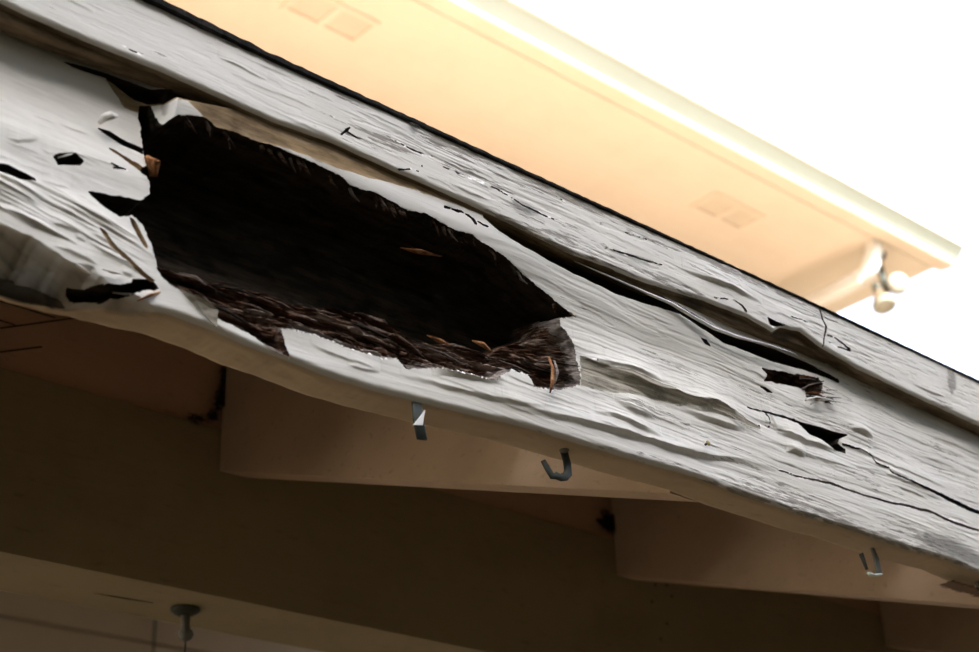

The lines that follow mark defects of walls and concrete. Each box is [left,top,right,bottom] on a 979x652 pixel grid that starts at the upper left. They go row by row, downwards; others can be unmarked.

spalling [88,79,572,354]
crack [791,309,851,352]
crack [747,407,979,532]